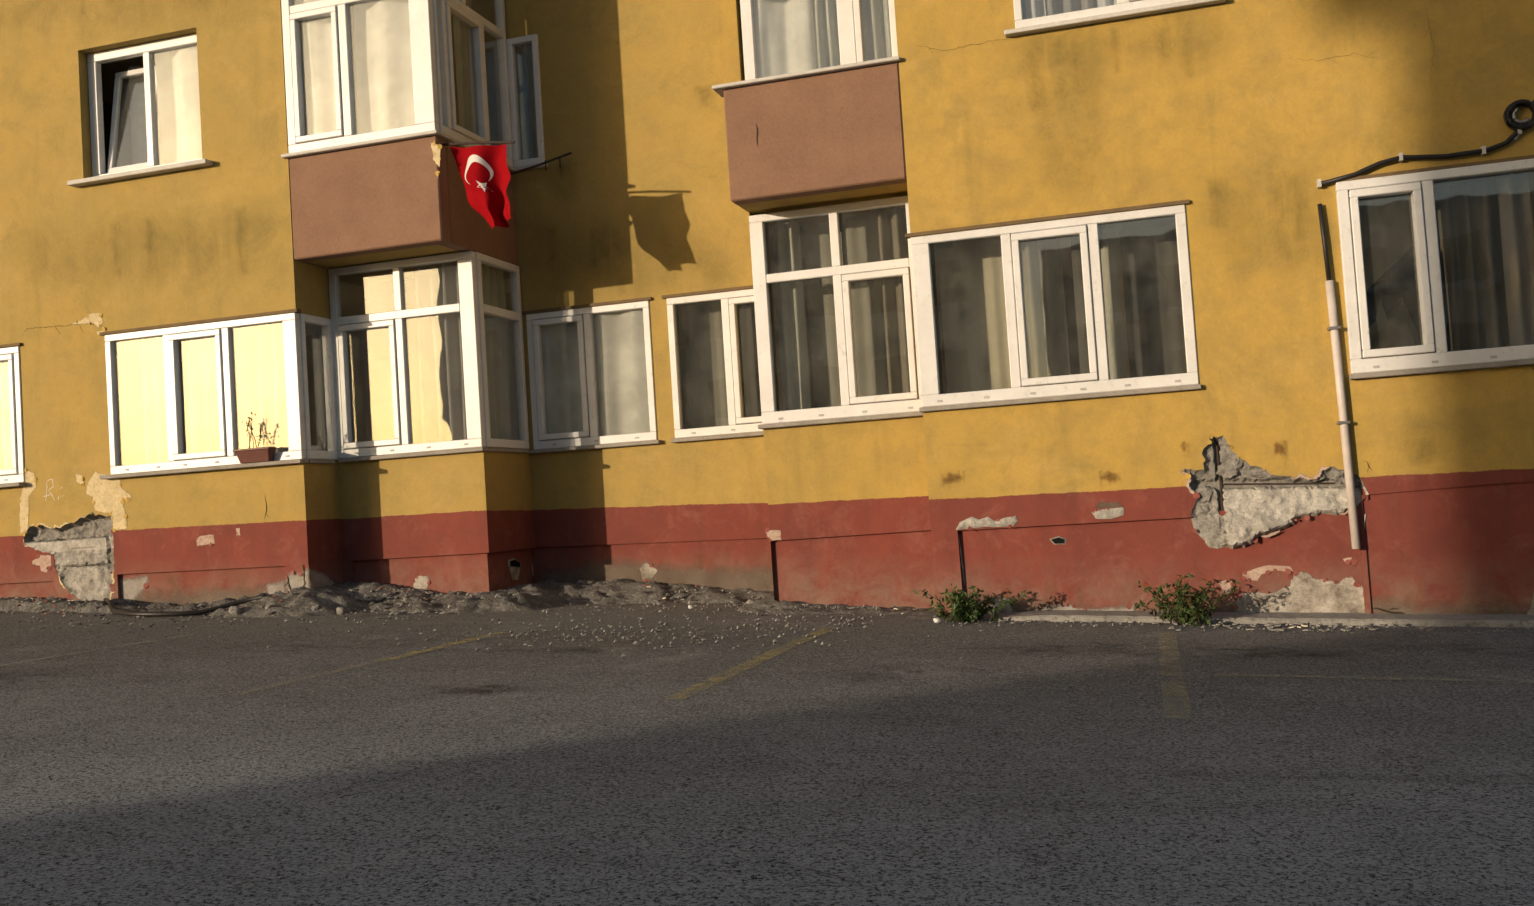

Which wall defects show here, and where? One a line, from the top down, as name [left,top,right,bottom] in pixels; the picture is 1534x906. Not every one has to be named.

spalling [18,469,131,601]
spalling [956,516,1018,531]
spalling [1092,503,1124,519]
spalling [1181,435,1369,549]
peeling [1219,557,1365,613]